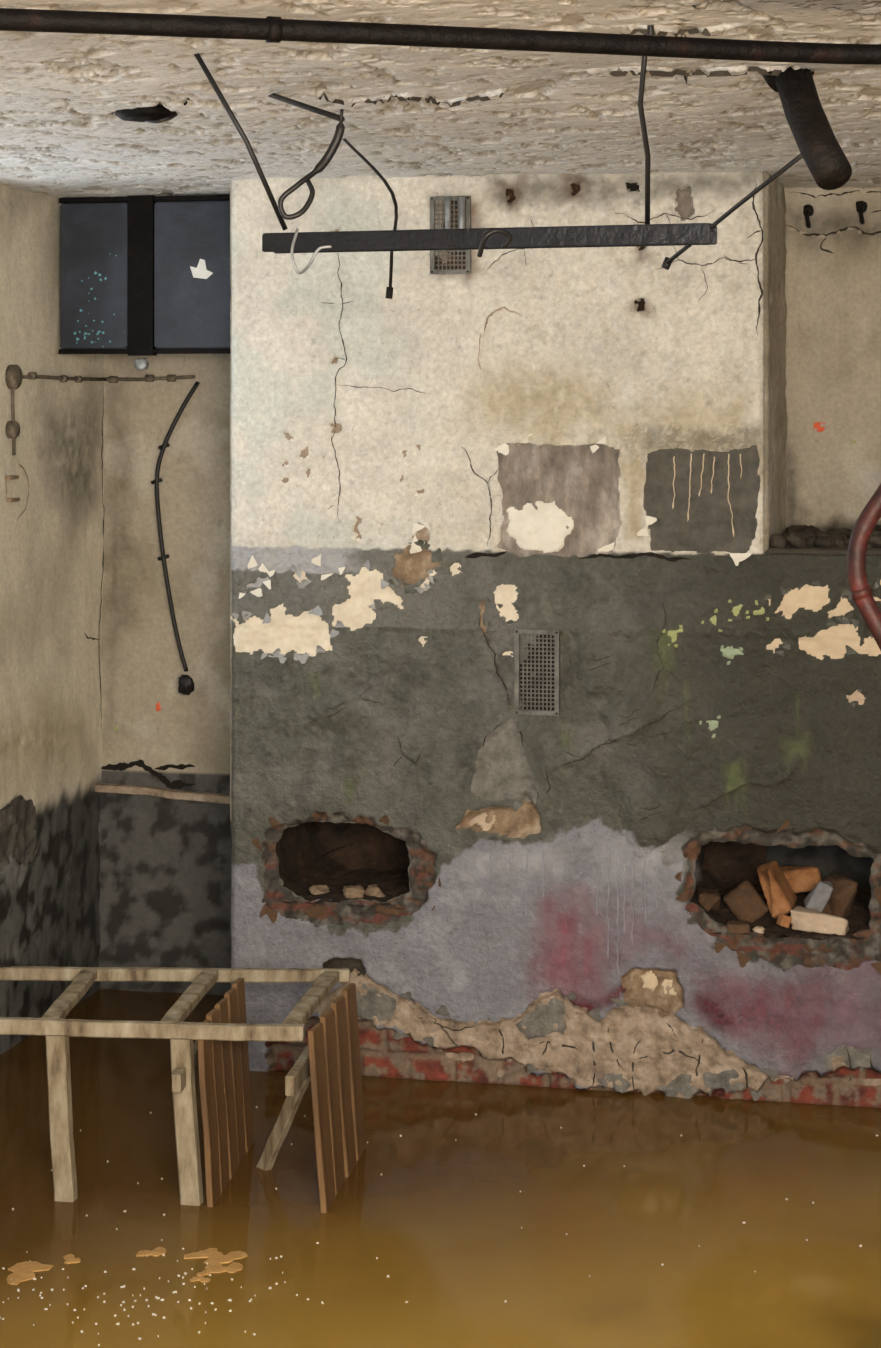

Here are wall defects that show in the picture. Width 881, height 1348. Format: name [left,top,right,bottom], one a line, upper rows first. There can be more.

crack [616,184,881,335]
crack [328,255,429,530]
crack [478,307,520,369]
peeling [230,522,463,664]
peeling [493,434,622,557]
peeling [637,516,657,536]
peeling [762,581,881,660]
peeling [846,690,866,707]
flaking render [456,704,547,839]
flaking render [251,812,441,927]
flaking render [675,820,881,975]
flaking render [265,958,881,1108]